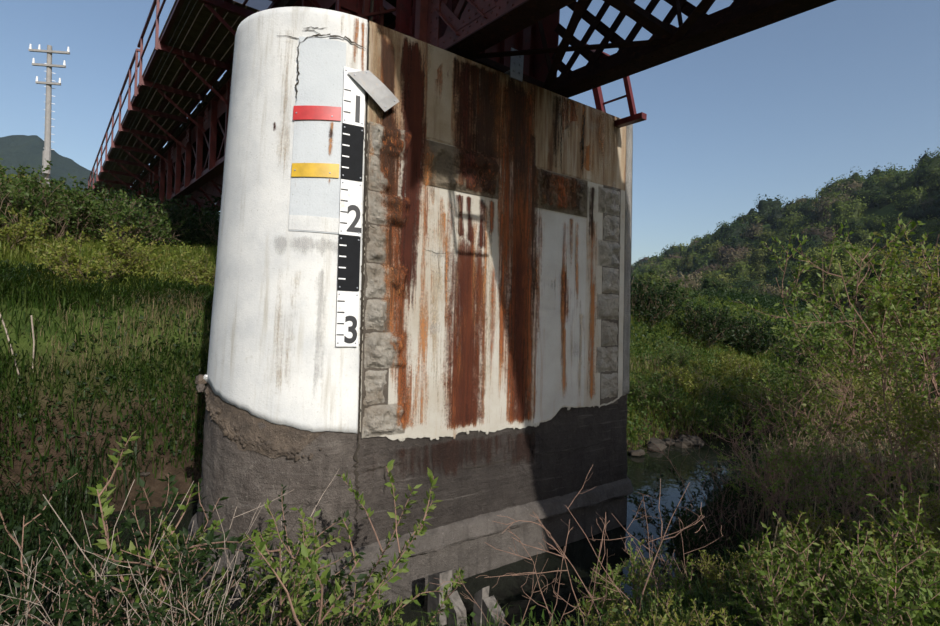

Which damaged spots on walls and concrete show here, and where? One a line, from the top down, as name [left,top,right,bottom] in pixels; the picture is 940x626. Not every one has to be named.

crack [283,24,406,521]
corrosion [354,18,364,71]
corrosion [372,34,546,428]
corrosion [561,219,579,393]